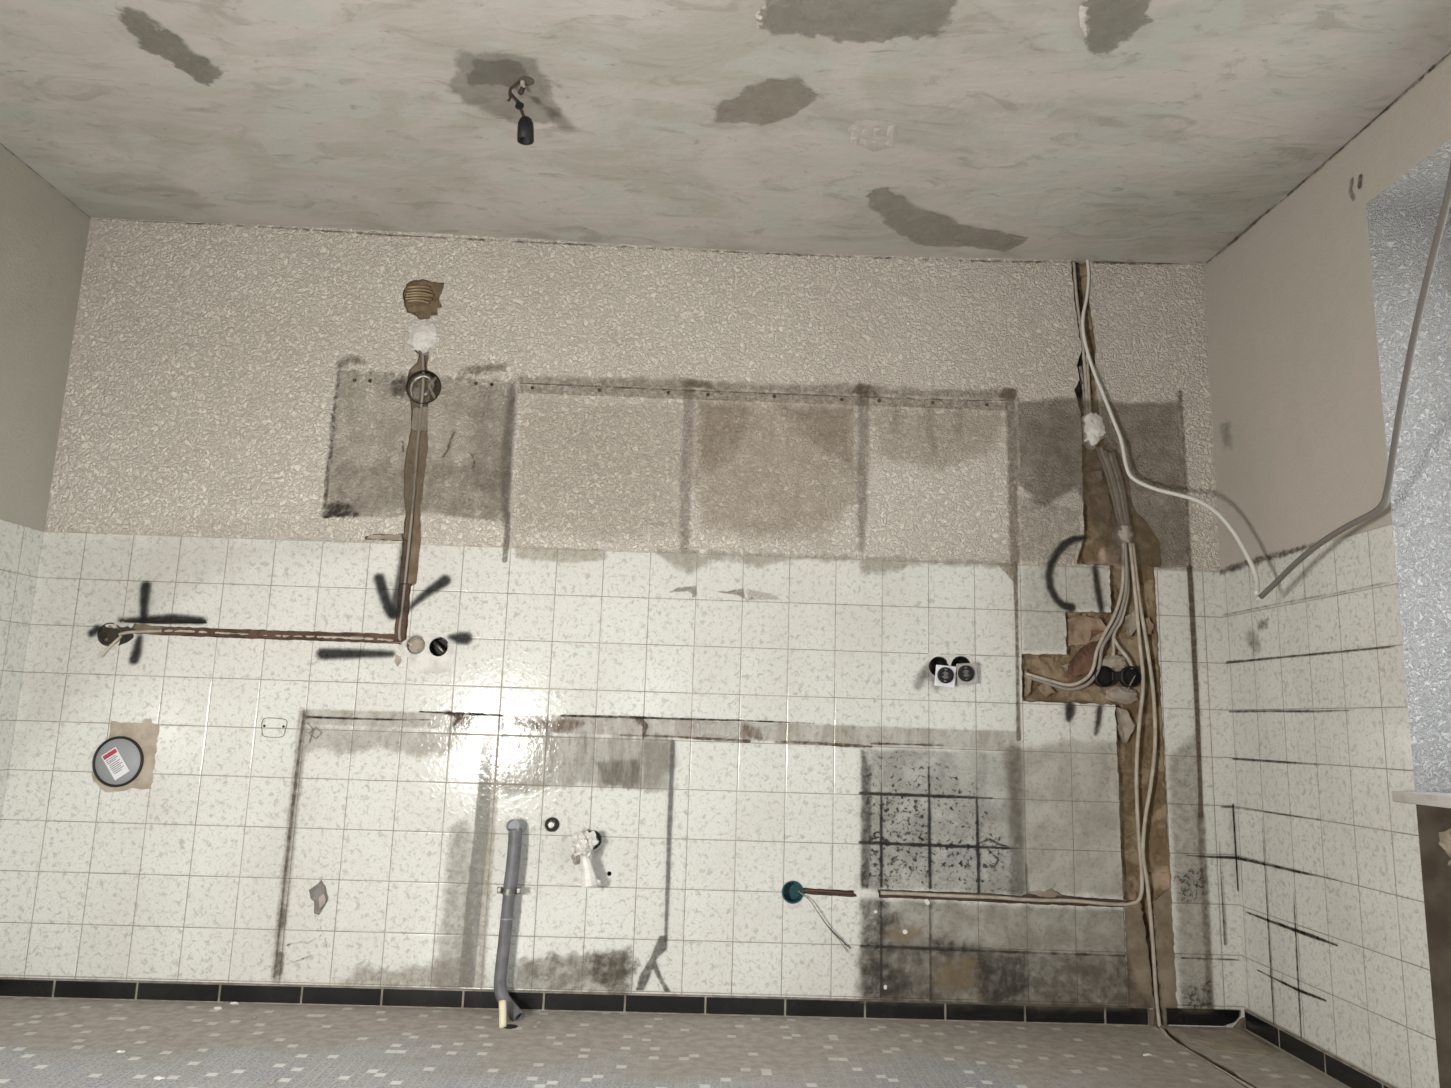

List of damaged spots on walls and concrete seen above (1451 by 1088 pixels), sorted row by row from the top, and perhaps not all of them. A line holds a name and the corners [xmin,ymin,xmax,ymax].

damp [859,752,1028,896]